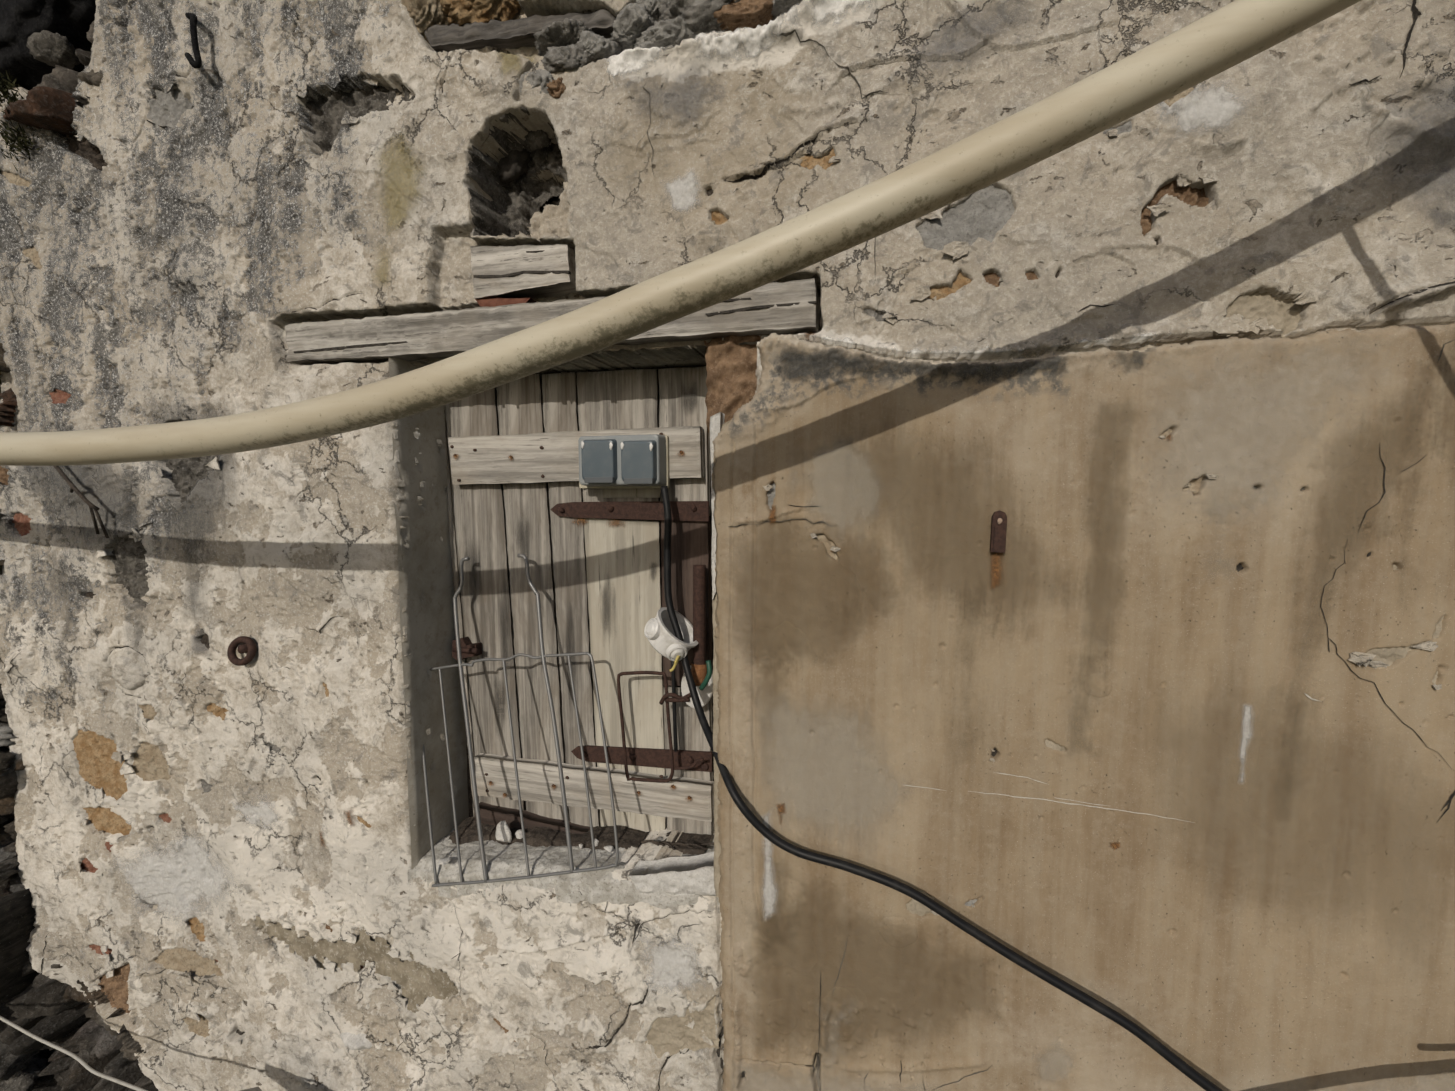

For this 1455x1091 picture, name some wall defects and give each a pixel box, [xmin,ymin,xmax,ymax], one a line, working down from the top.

spalling [401,0,520,44]
crack [1349,0,1422,86]
spalling [467,0,803,238]
spalling [910,184,1015,301]
spalling [1140,171,1218,245]
spalling [864,308,899,325]
leakage [780,333,1155,380]
crack [1320,455,1455,822]
leakage [1241,706,1251,781]
leakage [763,817,775,916]
crack [580,892,711,949]
crack [585,981,651,1049]